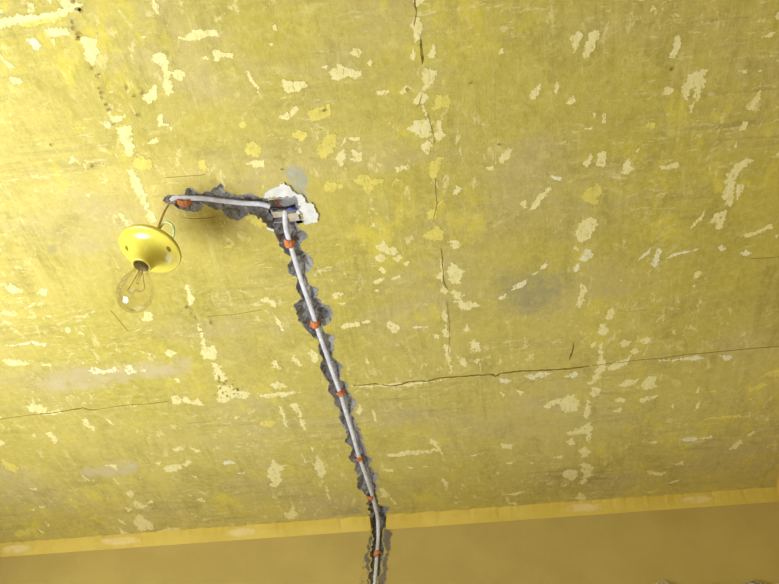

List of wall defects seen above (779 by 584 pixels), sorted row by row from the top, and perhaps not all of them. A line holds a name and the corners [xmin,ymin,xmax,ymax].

peeling [26,37,42,51]
peeling [0,0,83,46]
peeling [79,34,101,67]
peeling [142,52,186,104]
peeling [321,48,373,81]
crack [414,0,424,64]
peeling [690,157,755,229]
peeling [573,217,598,272]
crack [441,250,450,354]
peeling [543,308,652,500]
peeling [619,375,661,403]
peeling [267,459,289,488]